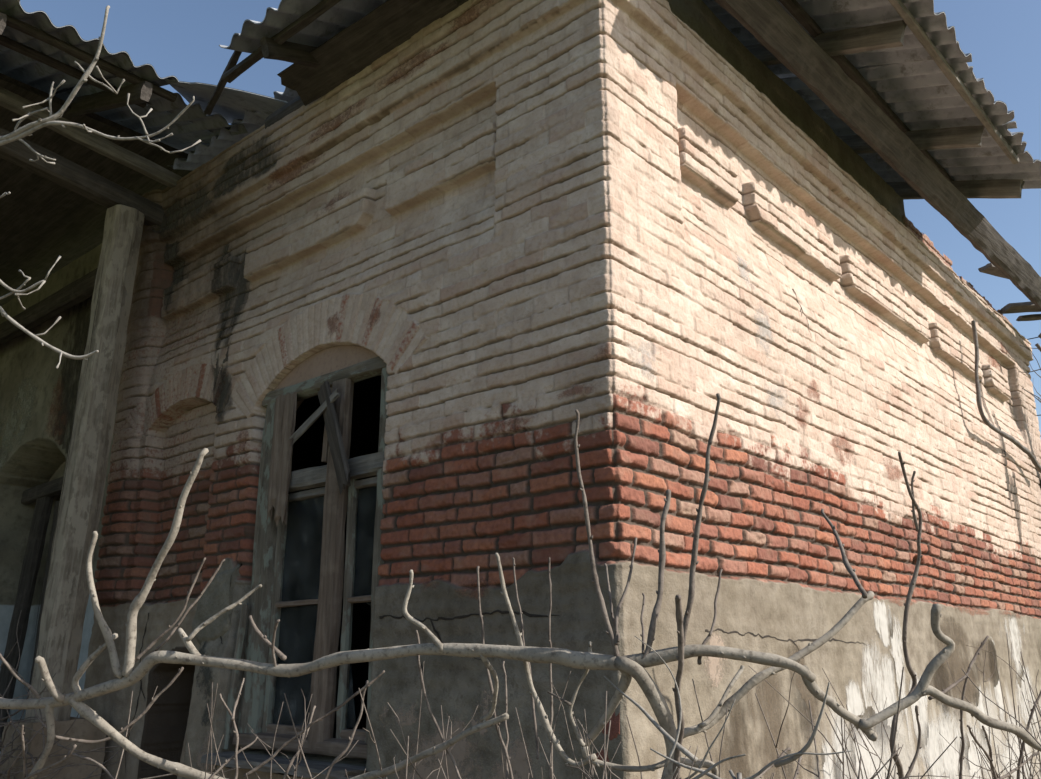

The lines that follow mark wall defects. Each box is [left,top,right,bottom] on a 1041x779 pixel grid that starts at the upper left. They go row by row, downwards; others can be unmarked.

leakage [154,137,277,309]
leakage [210,244,249,420]
crack [379,610,559,643]
crack [706,628,869,650]
leakage [934,623,996,715]